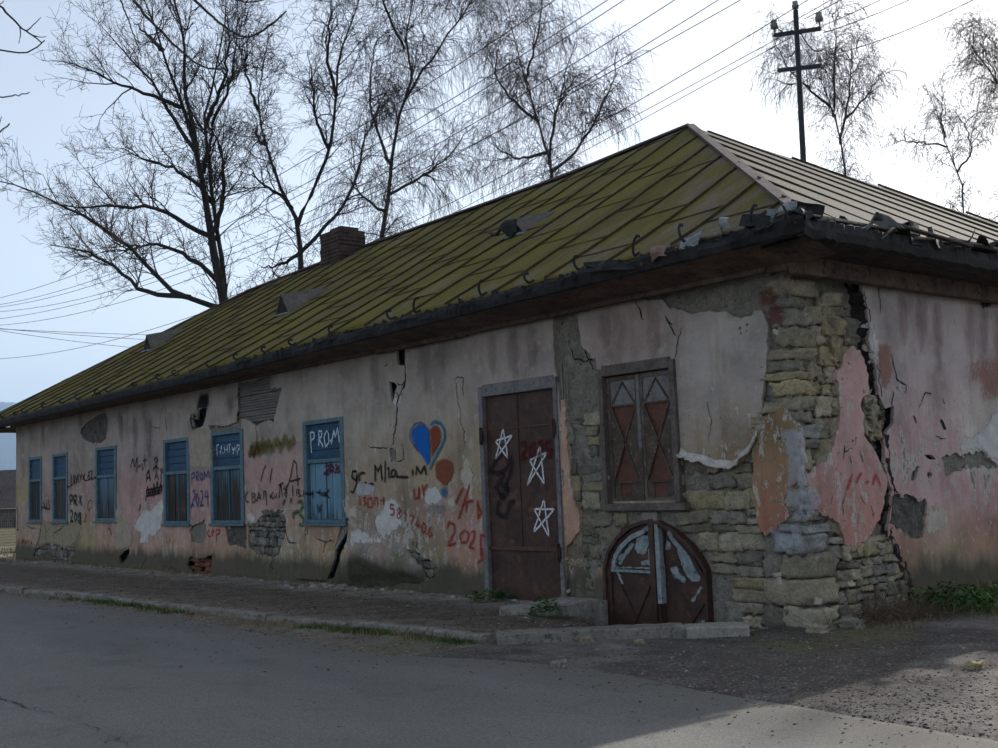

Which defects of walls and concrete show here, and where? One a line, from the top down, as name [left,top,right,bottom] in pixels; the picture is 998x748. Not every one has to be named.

flaking render [80,413,108,445]
flaking render [189,376,282,469]
crack [368,363,406,462]
flaking render [554,271,950,631]
crack [831,283,946,596]
peeling [907,412,998,482]
flaking render [190,556,212,574]
flaking render [226,507,287,559]